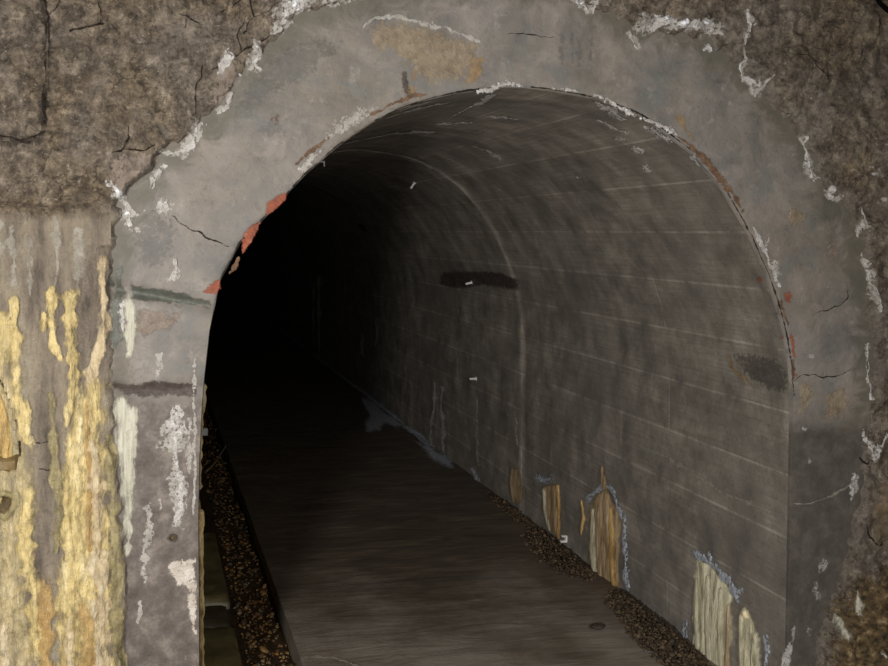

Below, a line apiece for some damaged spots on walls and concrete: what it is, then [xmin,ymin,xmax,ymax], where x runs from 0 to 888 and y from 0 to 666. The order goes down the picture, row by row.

crack [0,0,104,144]
crack [194,0,278,114]
damp [106,180,141,233]
spalling [108,152,158,191]
spalling [135,309,181,336]
corrosion [203,279,220,294]
corrosion [229,222,260,274]
corrosion [266,193,286,215]
crack [727,192,849,395]
damp [0,255,211,666]
damp [580,466,630,591]
damp [681,550,770,666]